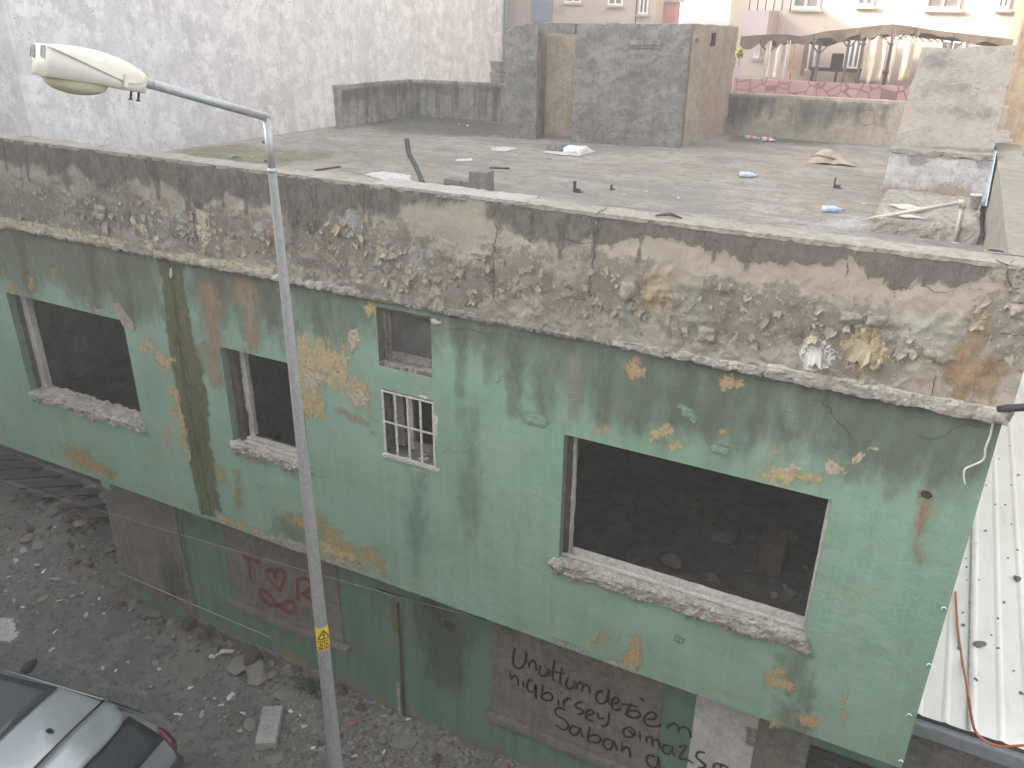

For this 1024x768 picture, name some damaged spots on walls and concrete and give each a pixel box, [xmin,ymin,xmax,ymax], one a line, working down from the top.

crack [476,224,499,303]
crack [560,201,674,321]
peeling [0,182,1009,427]
peeling [956,264,1024,385]
spalling [28,385,148,436]
peeling [85,302,191,462]
peeling [419,394,439,442]
spalling [757,441,879,487]
peeling [214,506,370,572]
spalling [547,556,811,655]
peeling [763,665,798,692]